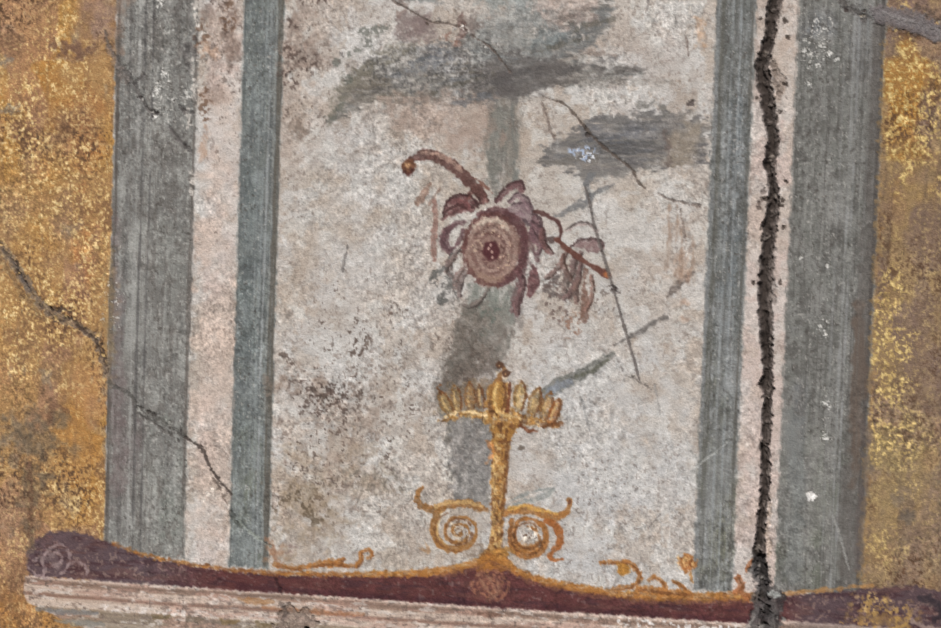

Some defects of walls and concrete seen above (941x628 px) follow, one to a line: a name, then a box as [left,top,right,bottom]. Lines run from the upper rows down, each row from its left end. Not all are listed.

crack [390,0,512,74]
crack [832,0,941,44]
crack [540,95,702,243]
crack [751,0,792,628]
crack [0,240,273,550]
spalling [271,577,321,628]